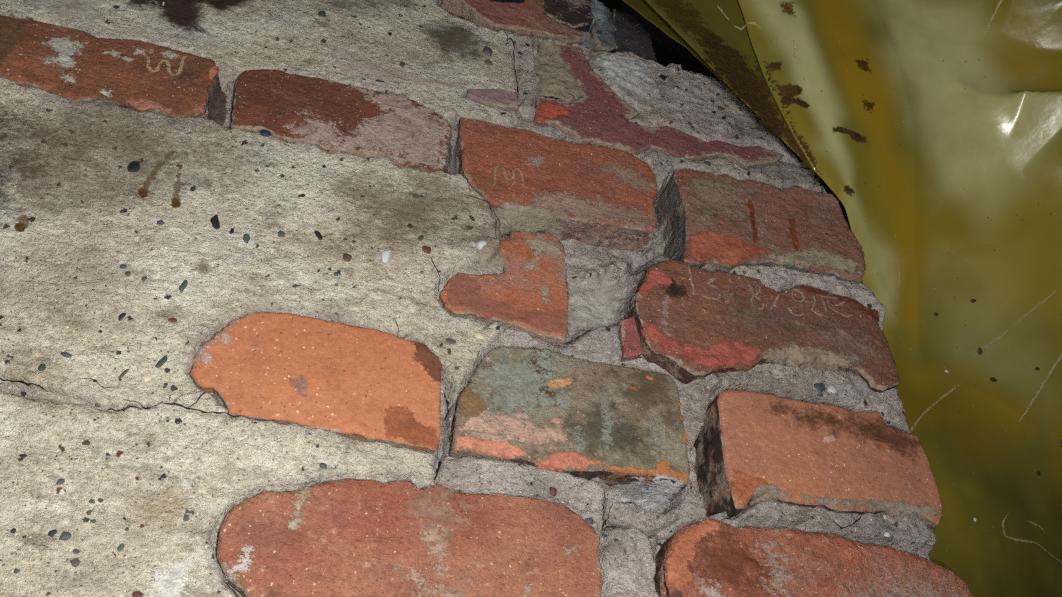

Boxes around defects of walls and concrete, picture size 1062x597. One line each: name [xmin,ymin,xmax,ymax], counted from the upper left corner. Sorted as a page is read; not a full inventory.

leakage [131,0,248,33]
crack [0,378,48,392]
crack [80,378,275,421]